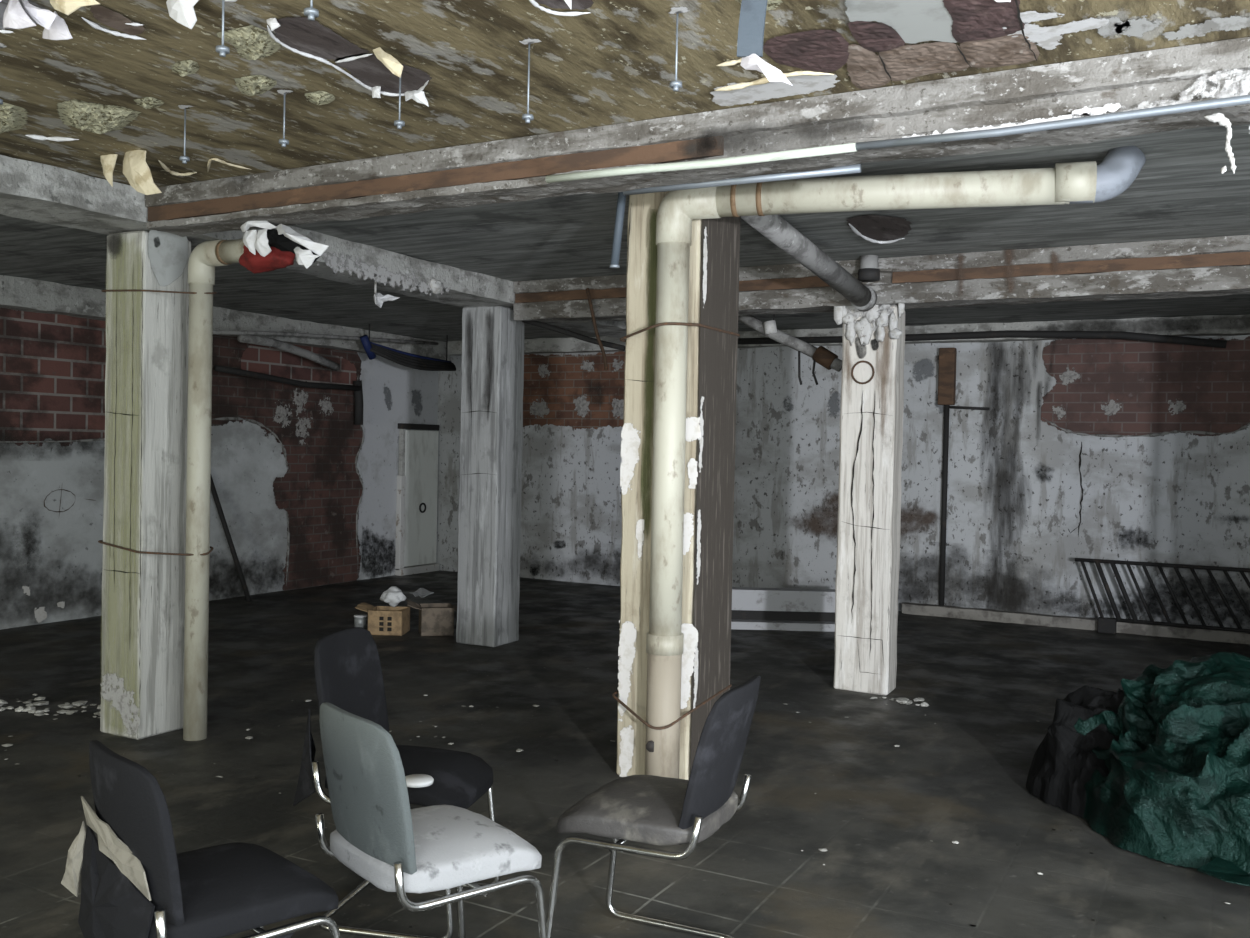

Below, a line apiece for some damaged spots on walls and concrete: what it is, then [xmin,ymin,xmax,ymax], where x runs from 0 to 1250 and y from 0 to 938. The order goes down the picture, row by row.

peeling [0,0,146,48]
peeling [844,0,957,44]
peeling [1003,11,1250,50]
water stain [1204,113,1236,174]
flaking render [211,334,439,591]
flaking render [523,351,641,495]
water stain [898,342,1081,612]
flaking render [1041,336,1250,438]
water stain [0,529,102,616]
water stain [209,562,282,596]
water stain [1119,530,1148,548]
peeling [618,620,636,777]